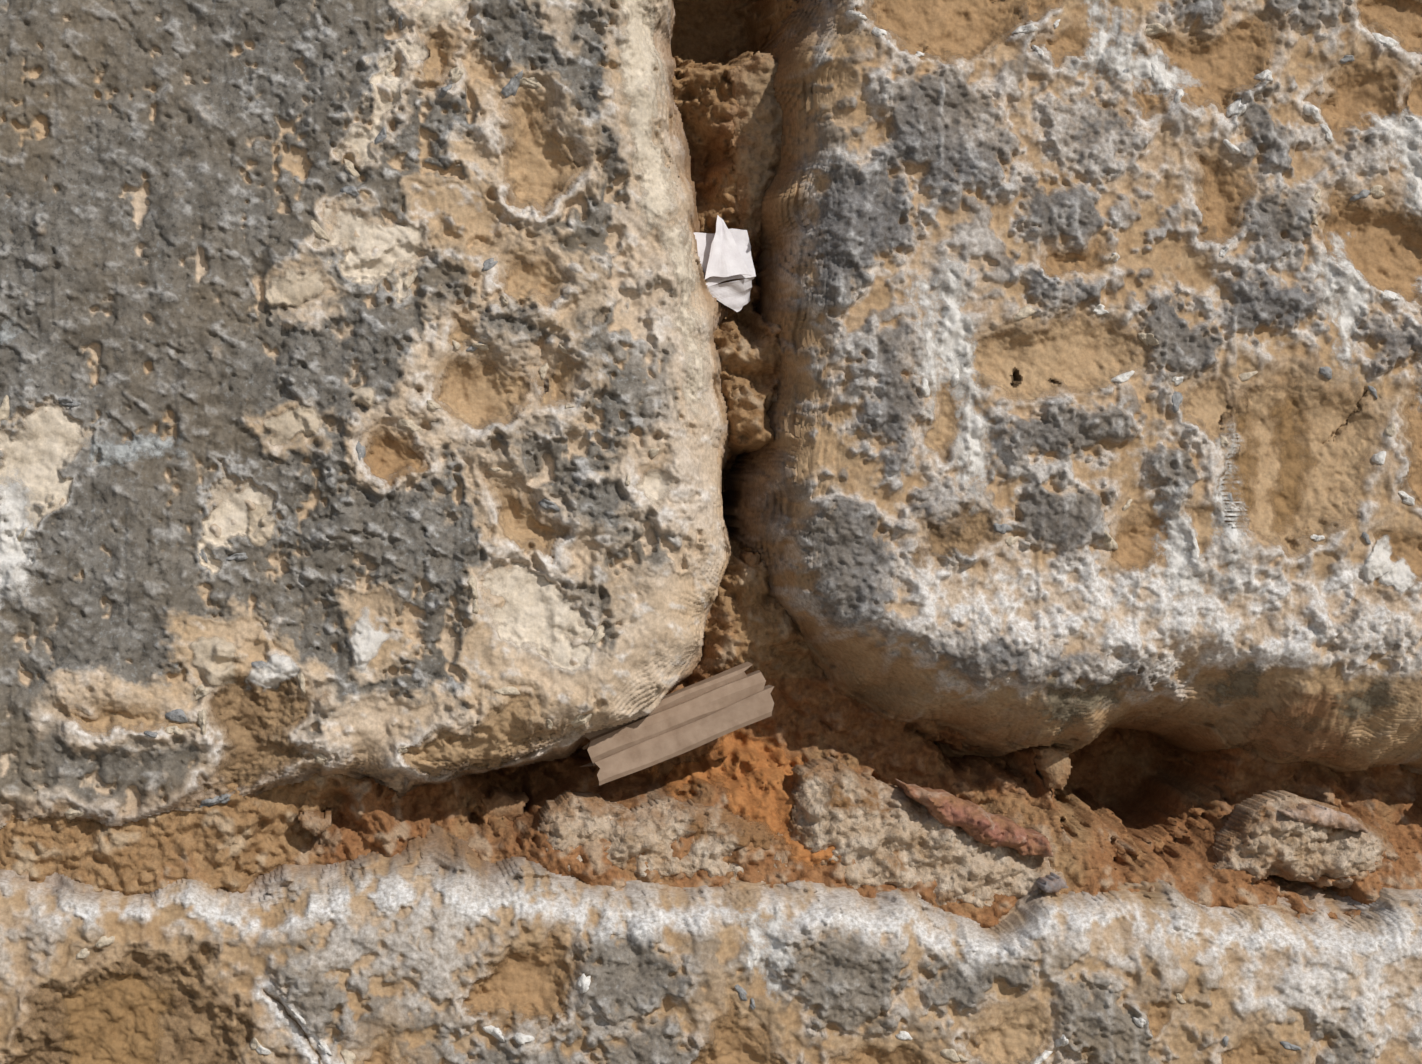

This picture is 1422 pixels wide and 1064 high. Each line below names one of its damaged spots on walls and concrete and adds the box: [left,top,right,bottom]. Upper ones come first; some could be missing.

crack [1328,390,1368,442]